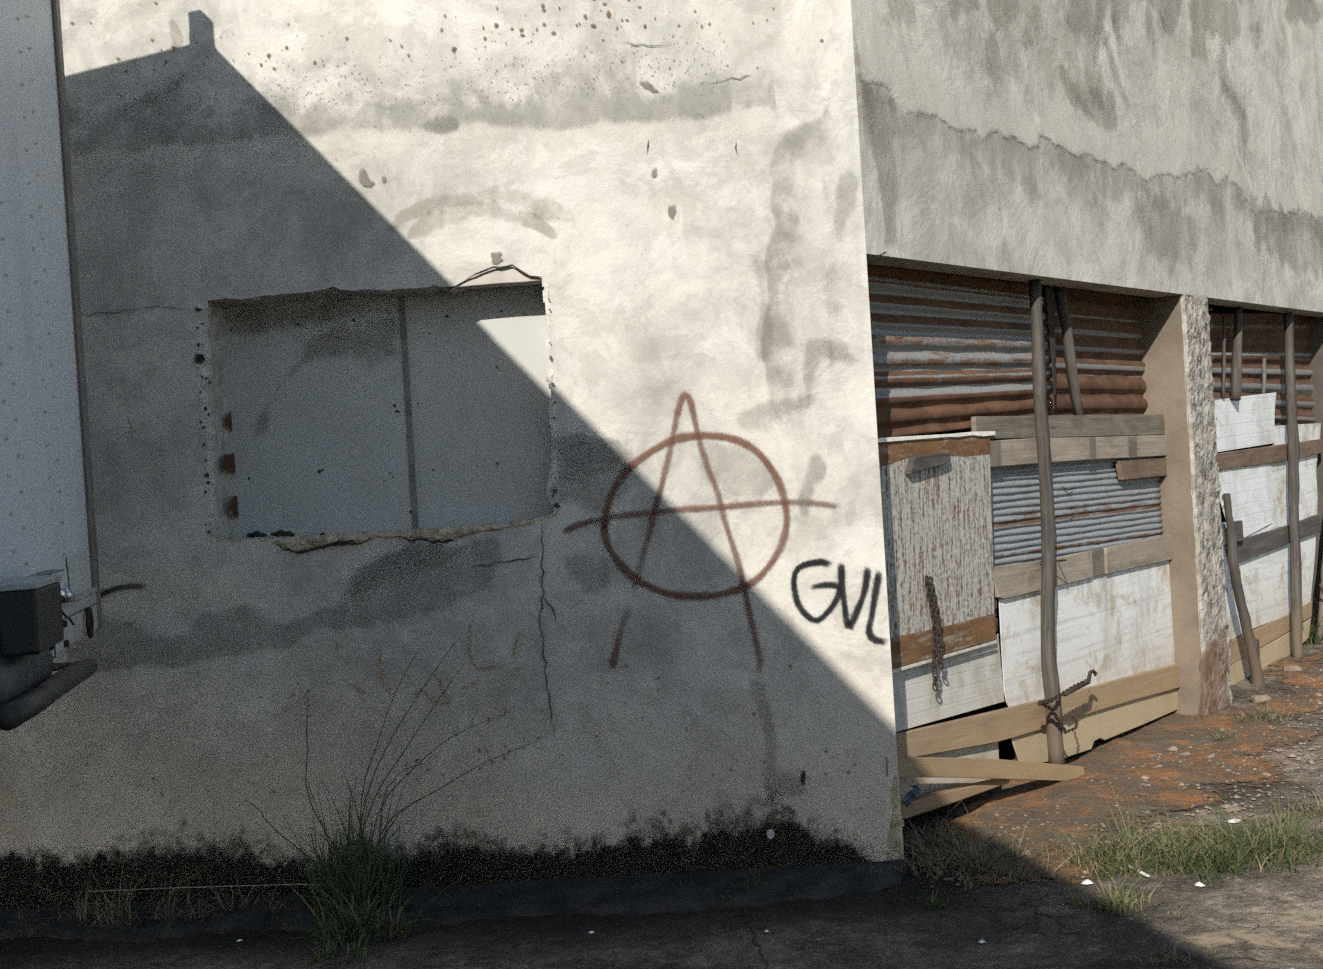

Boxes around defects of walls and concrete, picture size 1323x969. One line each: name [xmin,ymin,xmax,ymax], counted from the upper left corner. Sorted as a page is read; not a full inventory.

spalling [195,252,560,552]
crack [272,519,556,745]
leakage [0,796,868,910]